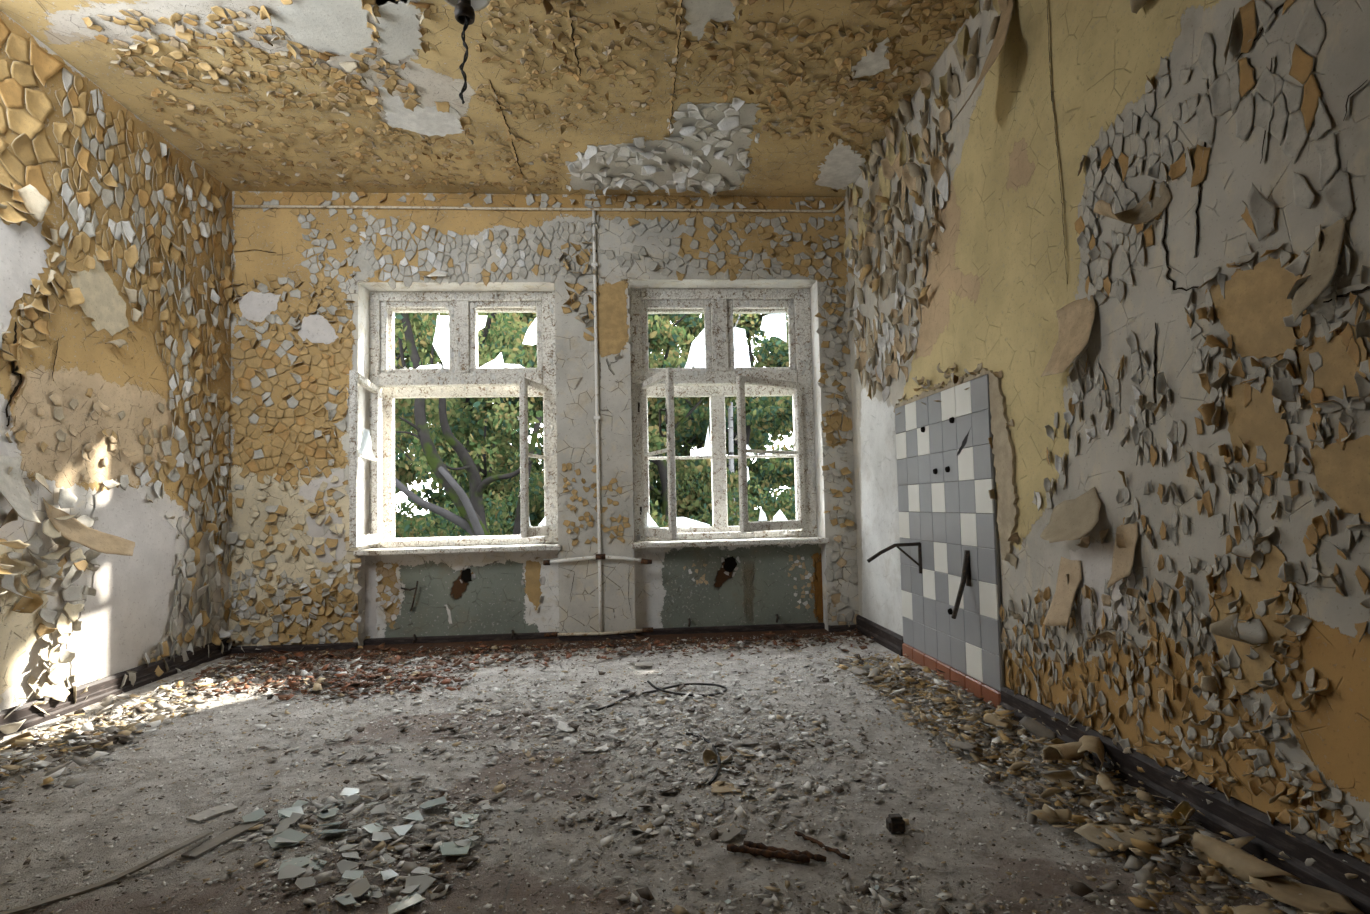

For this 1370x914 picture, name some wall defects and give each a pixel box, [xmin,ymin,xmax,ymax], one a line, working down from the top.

peeling [0,0,1020,734]
peeling [999,0,1370,883]
crack [1151,0,1285,425]
crack [1322,279,1370,303]
crack [1343,79,1368,121]